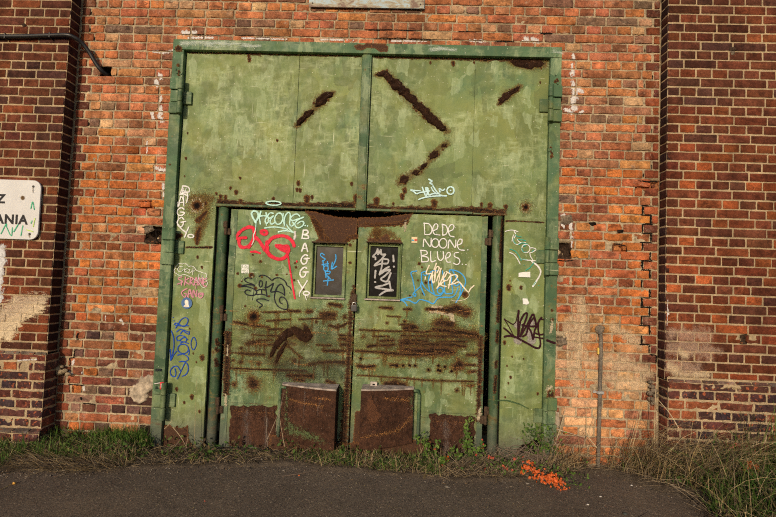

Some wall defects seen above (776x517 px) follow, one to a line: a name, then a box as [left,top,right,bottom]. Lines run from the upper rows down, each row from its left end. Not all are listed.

corrosion [175,43,548,70]
corrosion [185,71,545,269]
spalling [144,226,162,244]
corrosion [495,280,523,345]
corrosion [192,285,485,445]